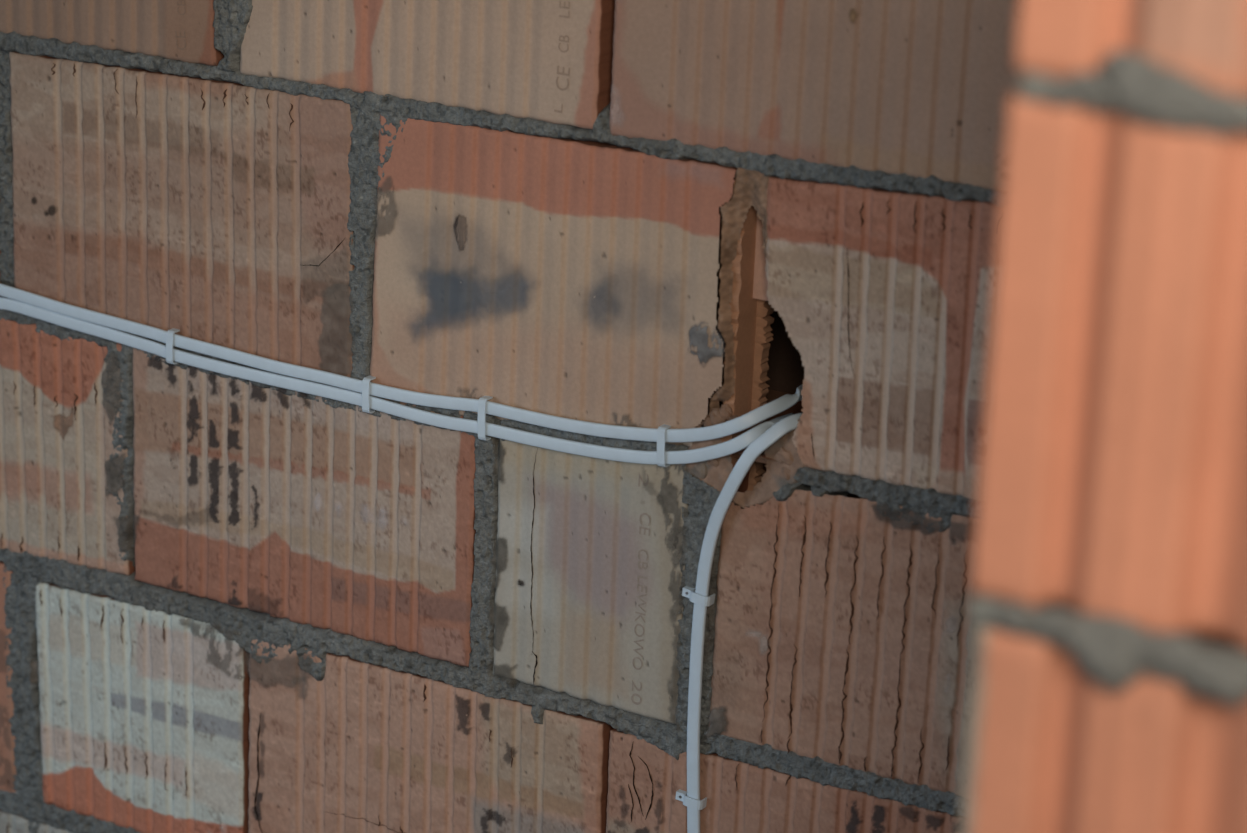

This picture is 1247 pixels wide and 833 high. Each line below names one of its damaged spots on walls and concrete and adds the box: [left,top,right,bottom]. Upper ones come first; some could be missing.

spalling [686,168,805,509]
crack [530,449,538,684]
crack [628,744,653,821]